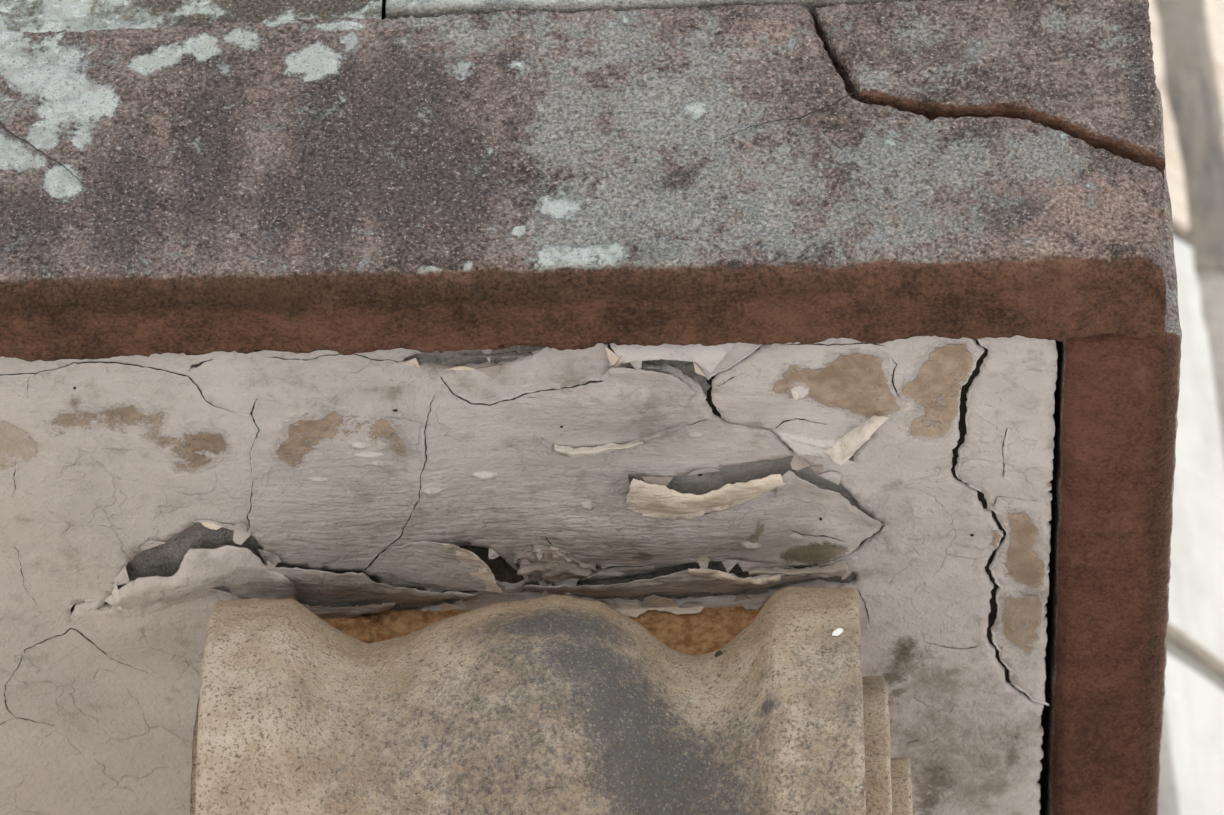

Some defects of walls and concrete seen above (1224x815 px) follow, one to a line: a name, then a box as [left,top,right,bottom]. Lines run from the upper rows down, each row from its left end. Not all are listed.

crack [0,121,84,186]
crack [0,359,261,533]
crack [268,354,398,364]
peeling [402,345,550,380]
peeling [105,519,859,619]
crack [365,373,602,570]
peeling [541,343,736,459]
peeling [611,415,889,528]
crack [667,341,904,455]
crack [788,525,887,562]
crack [912,339,1049,706]
crack [0,599,160,727]